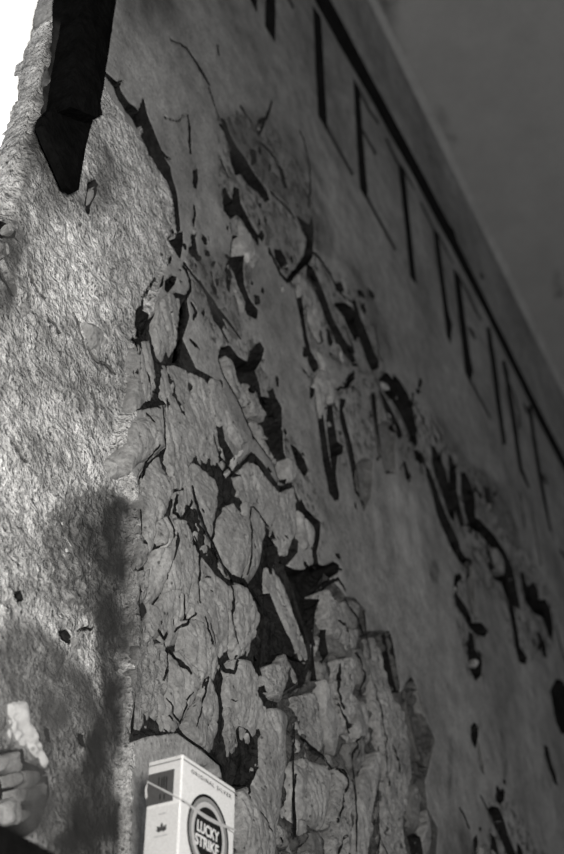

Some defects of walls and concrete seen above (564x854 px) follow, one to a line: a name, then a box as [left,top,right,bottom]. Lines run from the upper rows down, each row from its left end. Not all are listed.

spalling [85,179,98,214]
flaking render [111,98,564,854]
spalling [43,486,123,662]
flaking render [0,698,53,836]